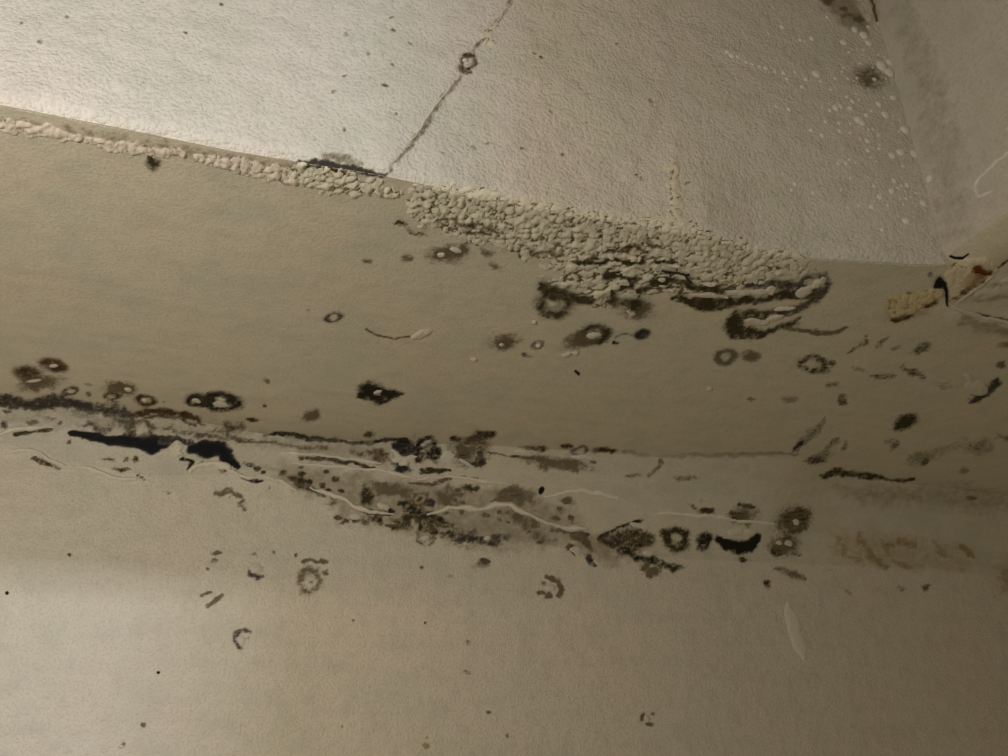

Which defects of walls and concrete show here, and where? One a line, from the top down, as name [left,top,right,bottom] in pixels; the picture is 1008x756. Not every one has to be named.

mould [535,270,848,366]
spalling [886,273,996,323]
crack [948,302,1008,325]
peeling [0,425,143,482]
peeling [222,466,394,516]
damp [0,358,617,546]
peeling [279,451,512,486]
mould [793,430,915,483]
mould [891,414,917,448]
damp [566,502,812,580]
damp [294,553,328,594]
damp [200,591,223,608]